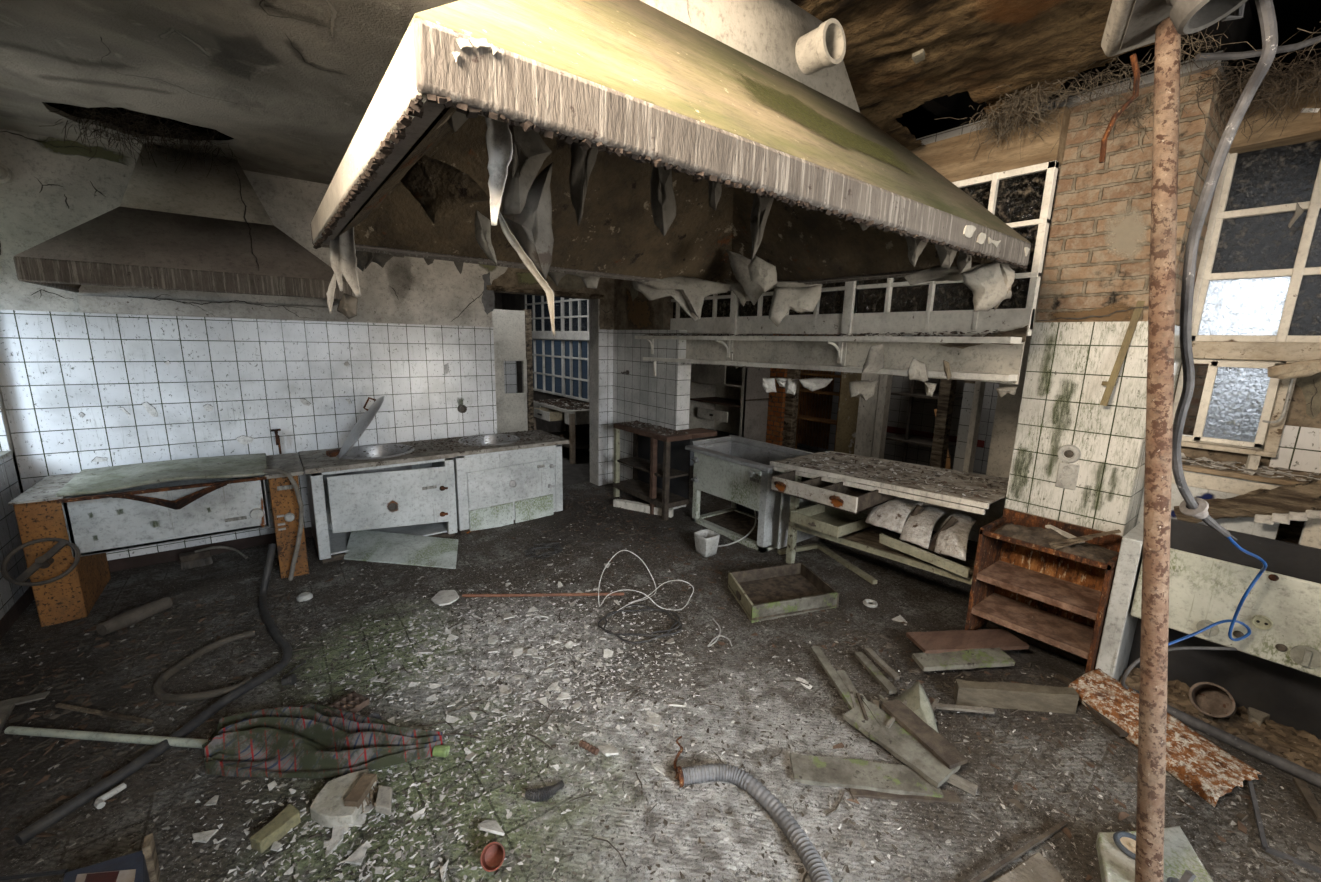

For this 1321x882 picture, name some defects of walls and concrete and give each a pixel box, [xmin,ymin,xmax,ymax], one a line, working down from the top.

peeling [963,225,1001,248]
leakage [1046,370,1074,424]